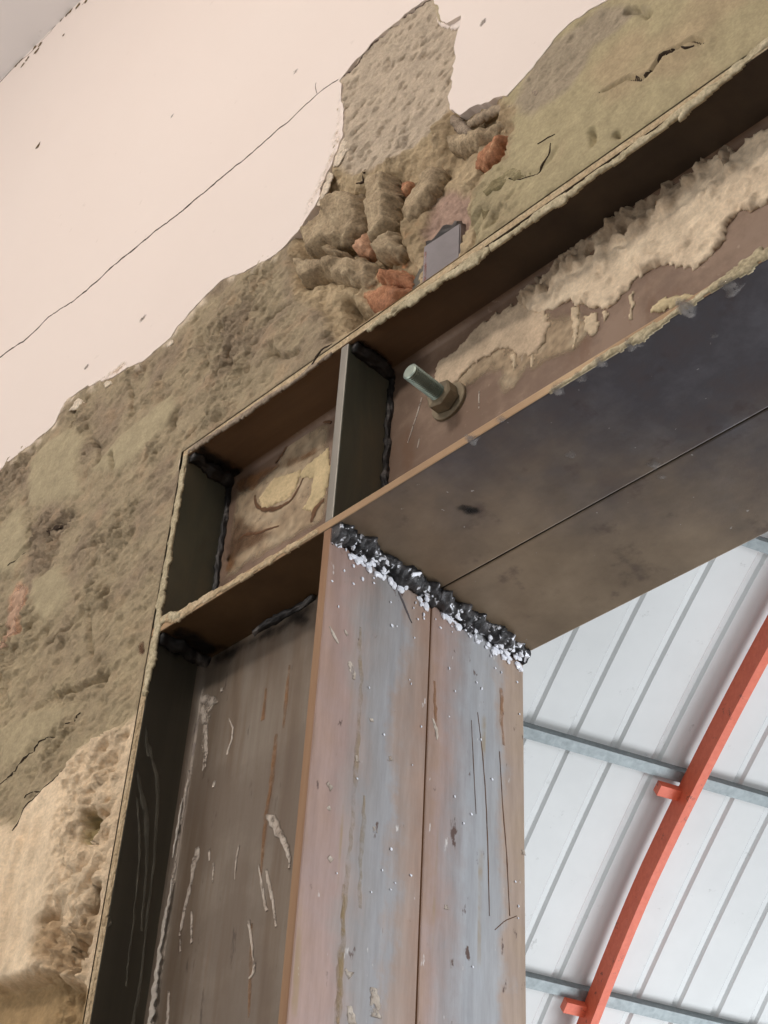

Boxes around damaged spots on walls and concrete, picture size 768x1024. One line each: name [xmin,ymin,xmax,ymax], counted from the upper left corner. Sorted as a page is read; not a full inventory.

crack [631,41,704,82]
crack [0,0,431,358]
spalling [289,0,531,342]
crack [508,134,555,180]
flaking render [0,586,25,649]
crack [0,712,81,831]
flaking render [0,715,136,1024]